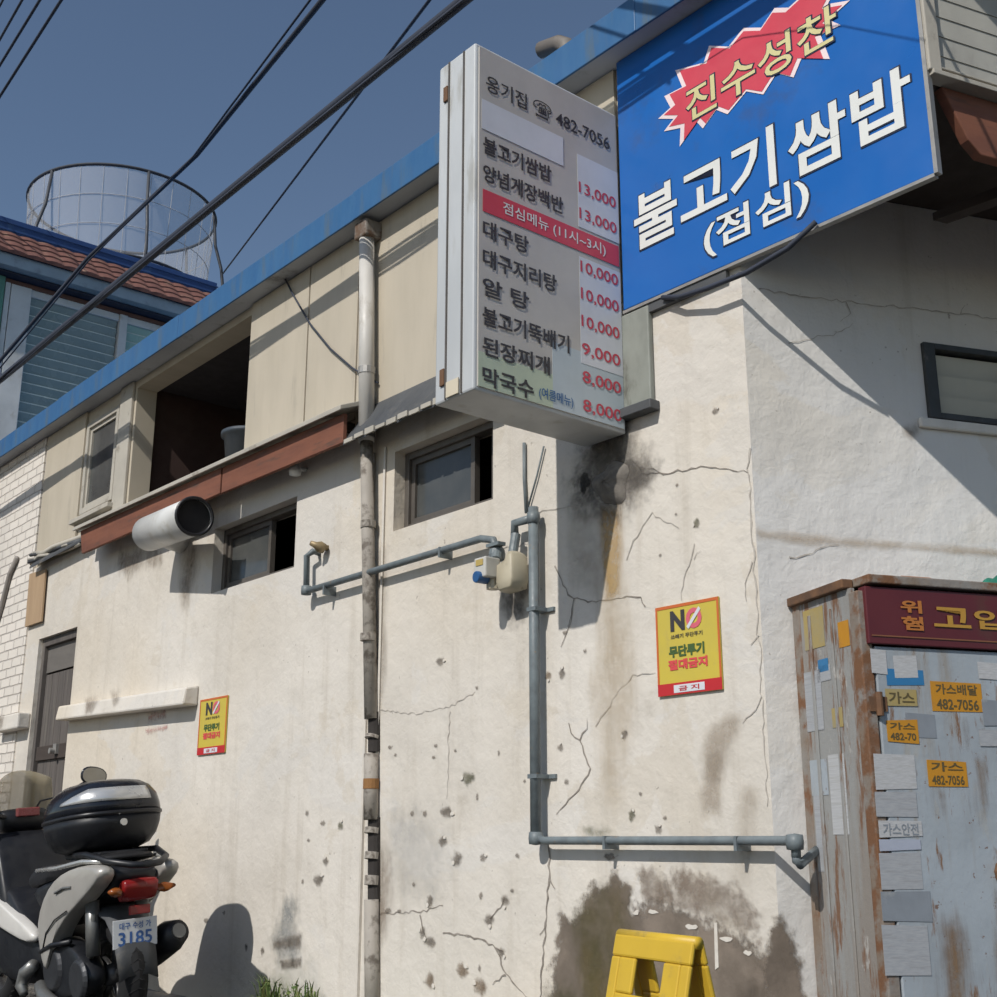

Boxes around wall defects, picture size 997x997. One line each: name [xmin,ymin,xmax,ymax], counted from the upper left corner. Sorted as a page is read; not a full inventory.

rust [602,510,619,594]
crack [554,566,646,646]
crack [626,448,768,806]
crack [557,673,653,813]
crack [380,845,555,997]
leakage [640,870,756,927]
rust [947,929,961,997]